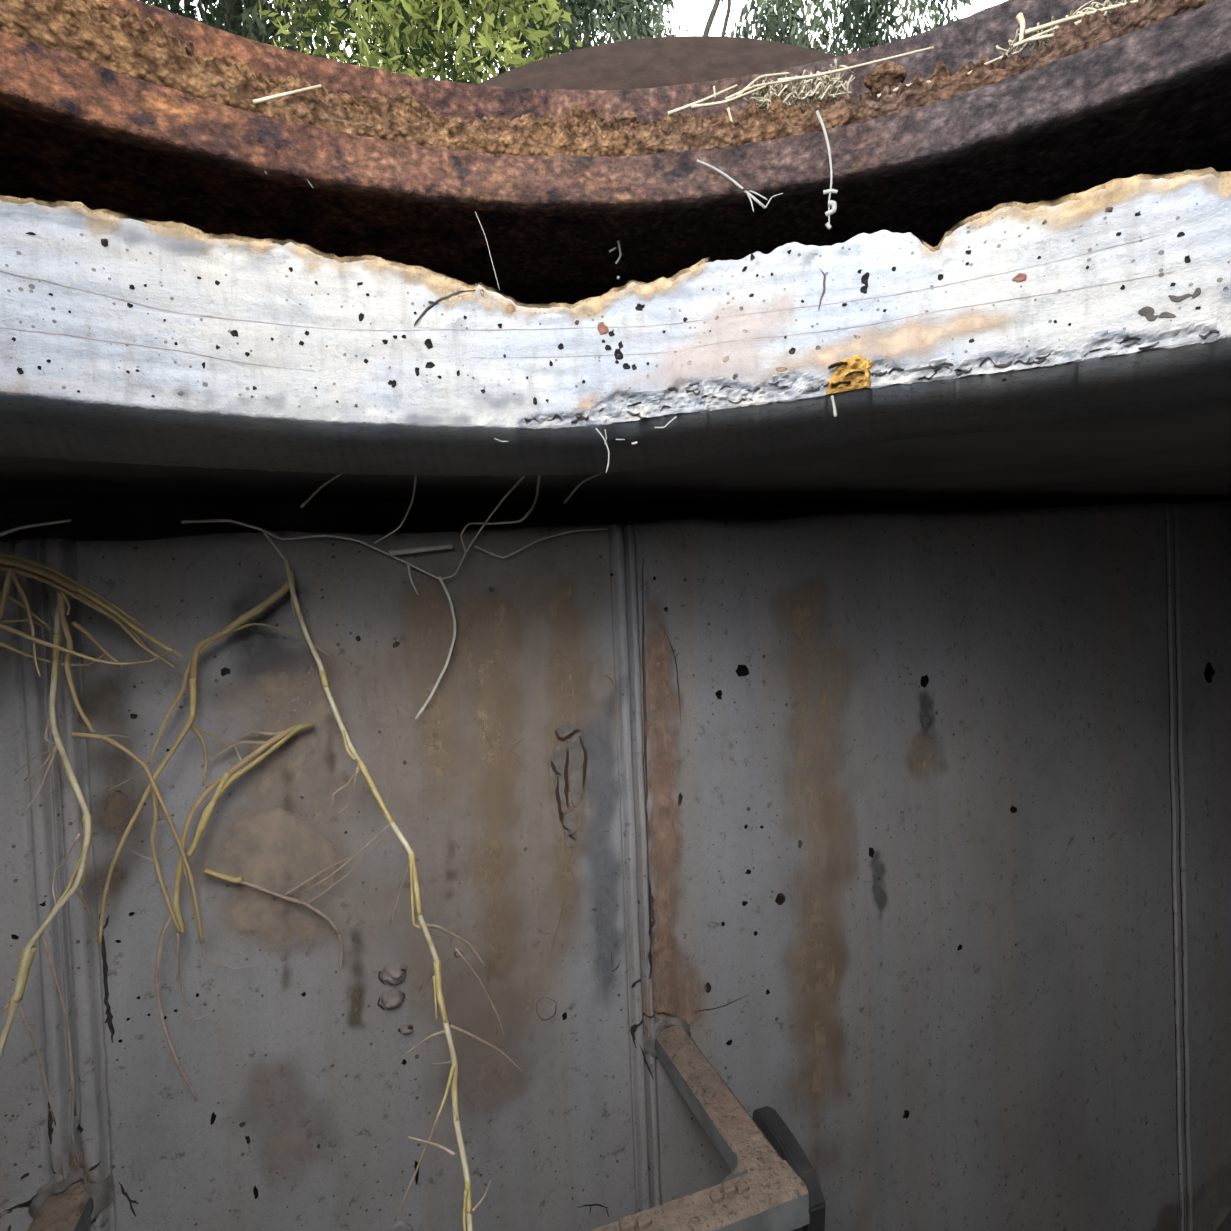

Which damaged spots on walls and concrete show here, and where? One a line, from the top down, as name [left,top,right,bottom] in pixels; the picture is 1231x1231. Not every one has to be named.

rust [809,314,1007,396]
spalling [516,370,829,429]
crack [98,913,115,1043]
crack [698,994,750,1012]
crack [0,1165,56,1231]
crack [77,1124,138,1217]